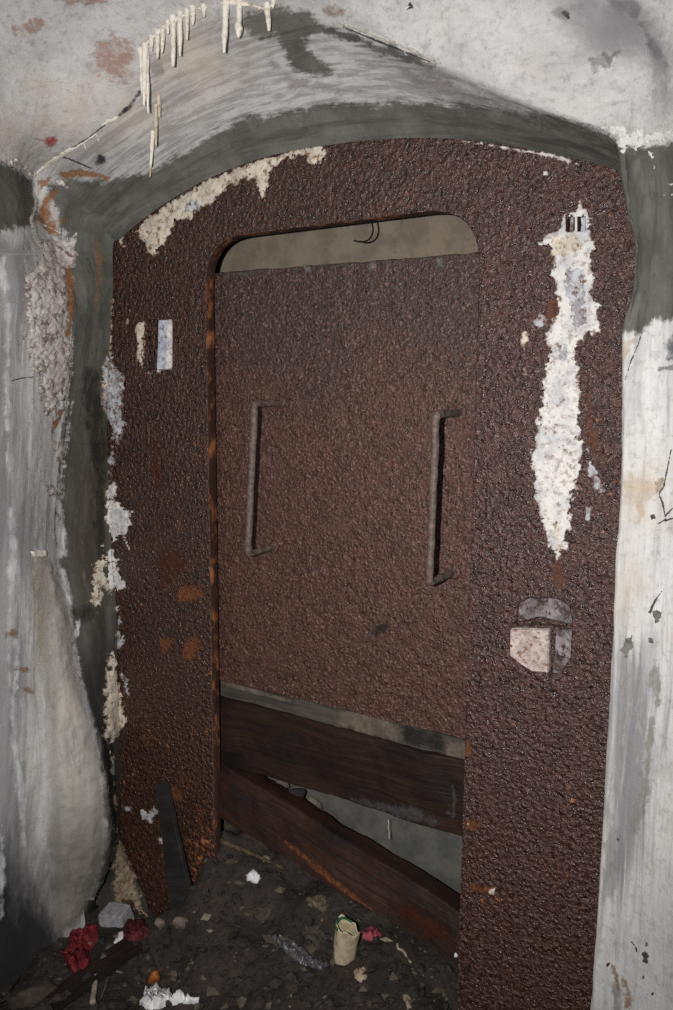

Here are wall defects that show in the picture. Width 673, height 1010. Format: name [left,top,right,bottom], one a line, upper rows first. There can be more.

efflorescence [137,0,276,177]
leakage [0,256,11,473]
leakage [5,299,133,846]
corrosion [611,965,631,1010]